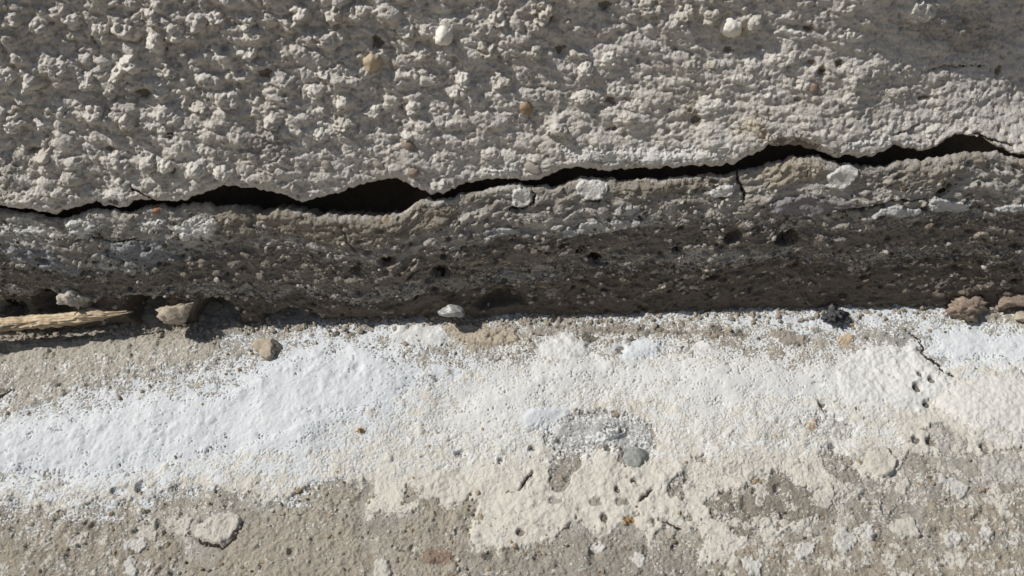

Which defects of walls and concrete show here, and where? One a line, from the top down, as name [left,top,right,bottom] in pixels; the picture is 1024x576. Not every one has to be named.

crack [0,124,1024,218]
water stain [0,141,1024,558]